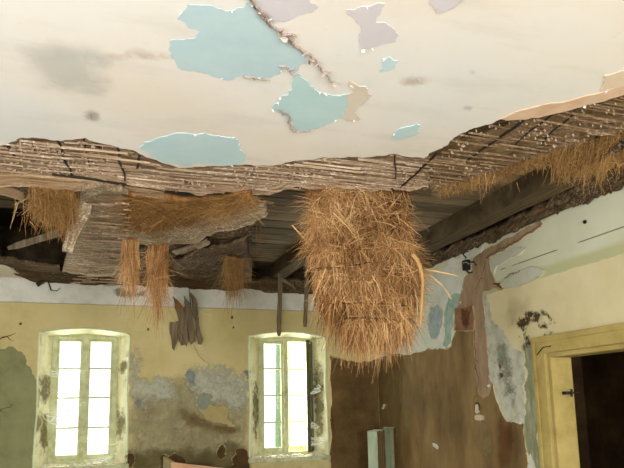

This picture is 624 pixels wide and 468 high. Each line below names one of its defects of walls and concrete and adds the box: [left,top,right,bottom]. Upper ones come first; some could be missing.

peeling [169,0,372,131]
crack [249,0,336,87]
peeling [347,3,399,53]
peeling [500,70,624,120]
peeling [139,132,246,167]
peeling [392,123,420,140]
flaking render [328,220,545,468]
water stain [516,310,552,348]
water stain [497,345,511,394]
peeling [0,346,43,468]